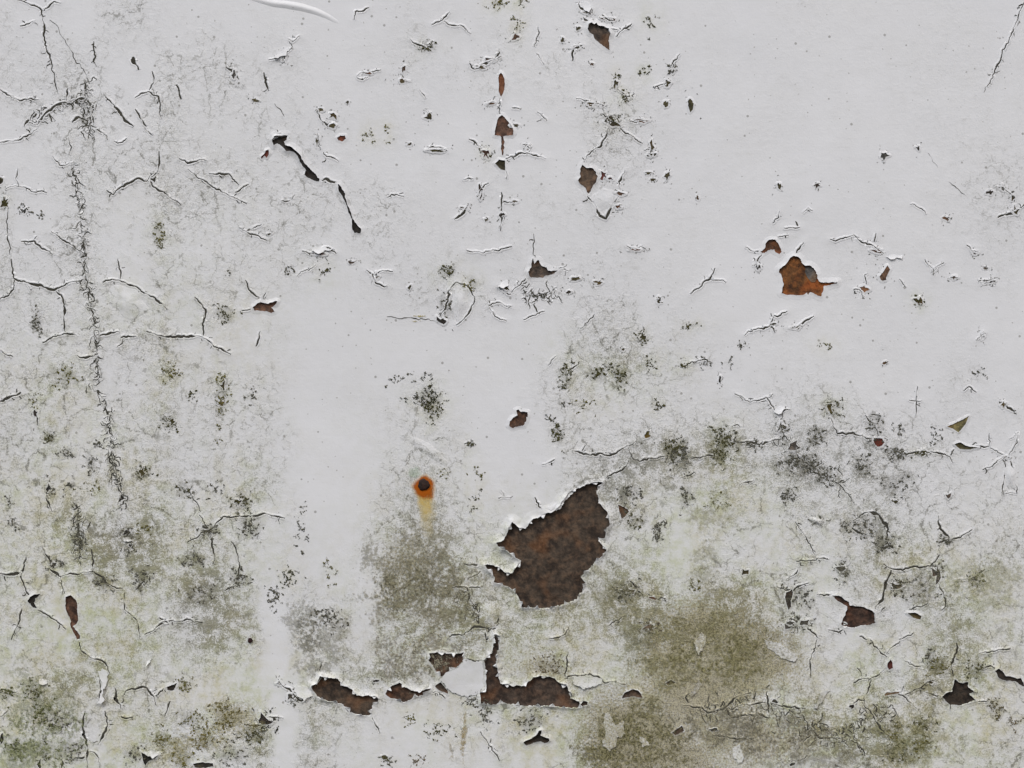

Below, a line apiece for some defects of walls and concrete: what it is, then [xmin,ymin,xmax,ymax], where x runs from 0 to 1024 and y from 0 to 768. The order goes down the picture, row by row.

peeling [472,56,525,173]
crack [0,0,268,511]
crack [0,497,203,768]
water stain [124,698,279,768]
water stain [384,372,449,425]
corrosion [413,476,433,510]
peeling [254,628,602,740]
peeling [477,474,632,617]
water stain [569,695,698,768]
crack [682,384,1020,767]
peeling [829,557,880,632]
water stain [774,397,943,506]